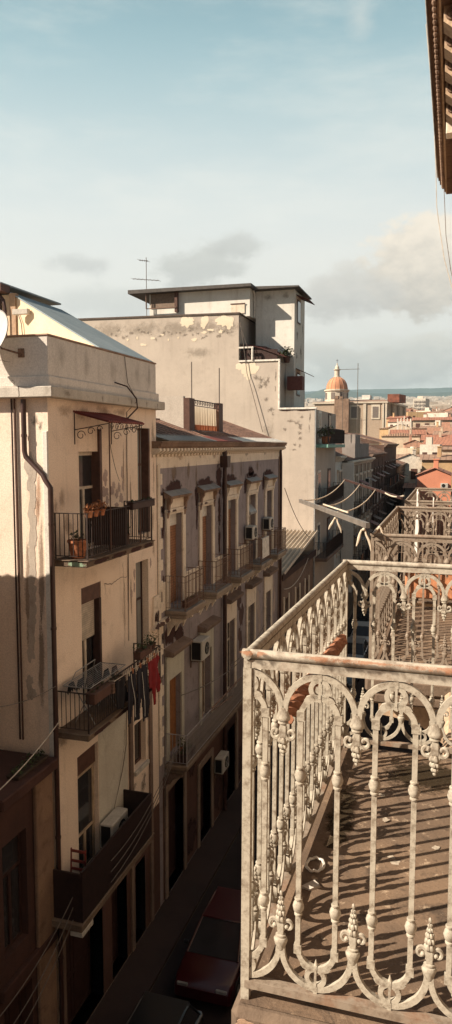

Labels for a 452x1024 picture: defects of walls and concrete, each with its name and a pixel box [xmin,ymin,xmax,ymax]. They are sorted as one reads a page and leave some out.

flaking render [127,315,234,346]
leakage [26,526,44,690]